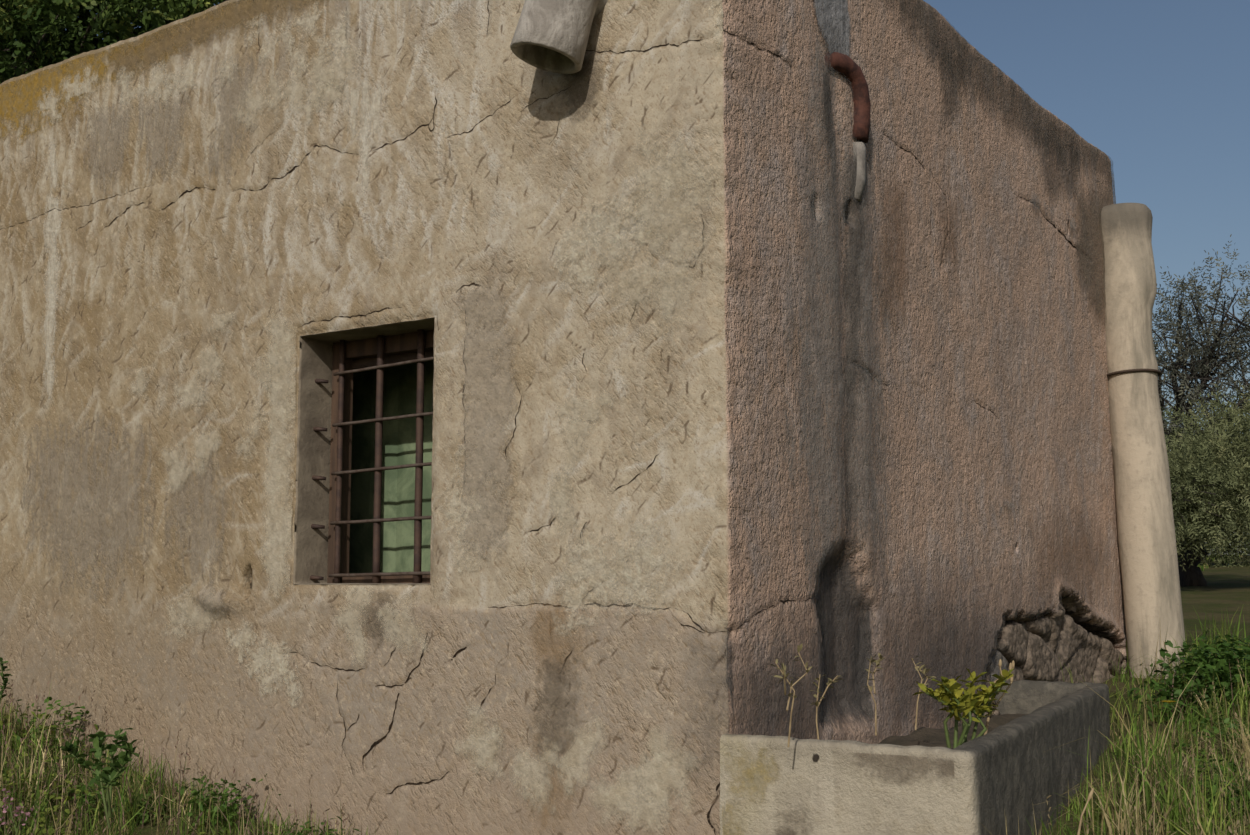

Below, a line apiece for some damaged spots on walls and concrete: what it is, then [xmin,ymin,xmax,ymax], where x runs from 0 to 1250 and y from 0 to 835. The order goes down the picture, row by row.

crack [586,30,790,64]
crack [9,89,567,229]
crack [282,636,467,774]
crack [488,582,808,633]
spalling [981,594,1127,716]
crack [386,771,449,794]